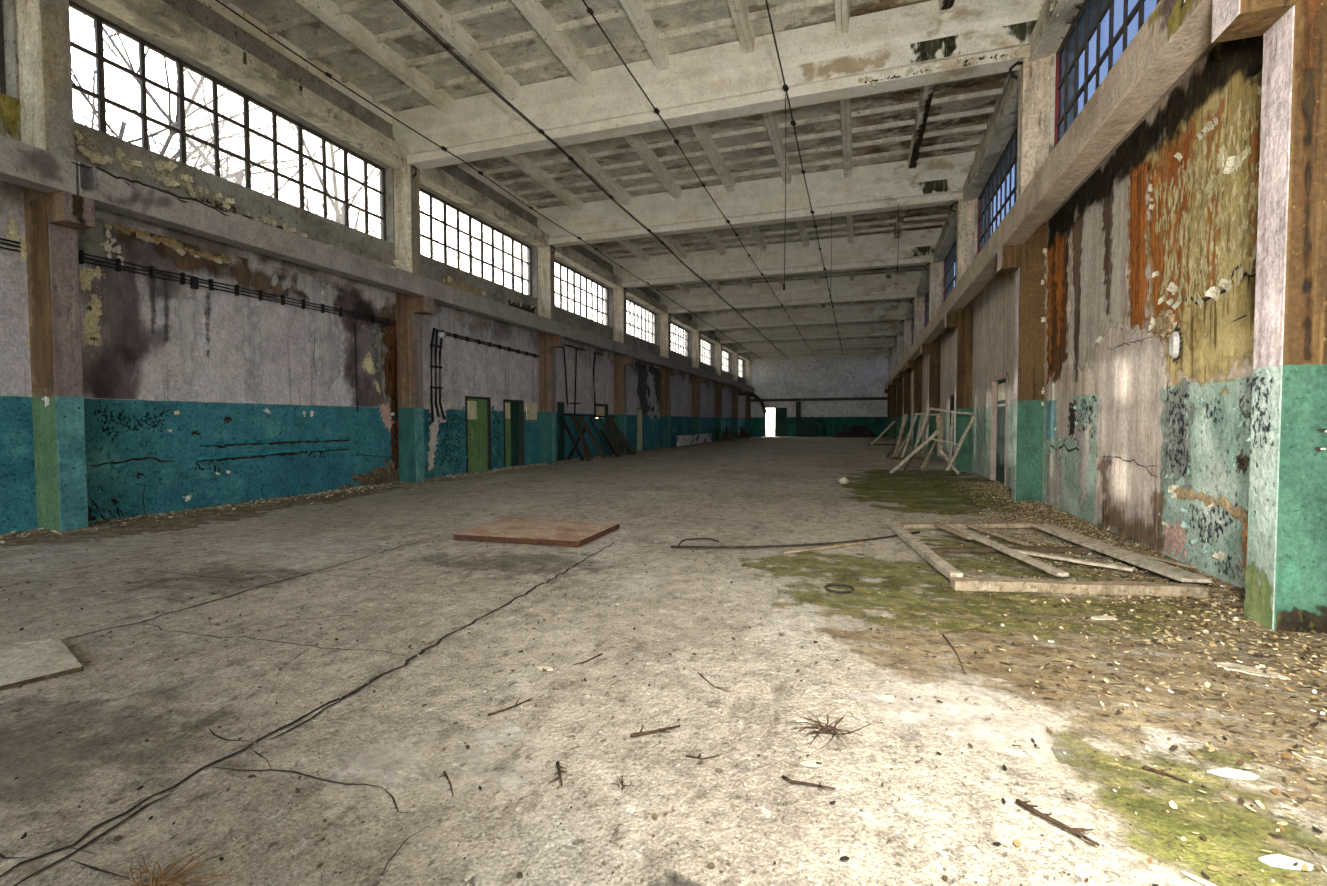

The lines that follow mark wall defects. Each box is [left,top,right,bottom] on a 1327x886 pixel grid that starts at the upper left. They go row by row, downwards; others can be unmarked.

spalling [858,67,939,86]
water stain [1163,0,1176,28]
water stain [1298,0,1320,145]
peeling [74,128,308,238]
peeling [79,223,239,346]
water stain [72,162,396,407]
spalling [1041,85,1277,583]
water stain [1303,162,1313,361]
crack [100,567,409,668]
crack [0,852,29,860]
crack [71,847,130,879]
crack [208,728,428,886]